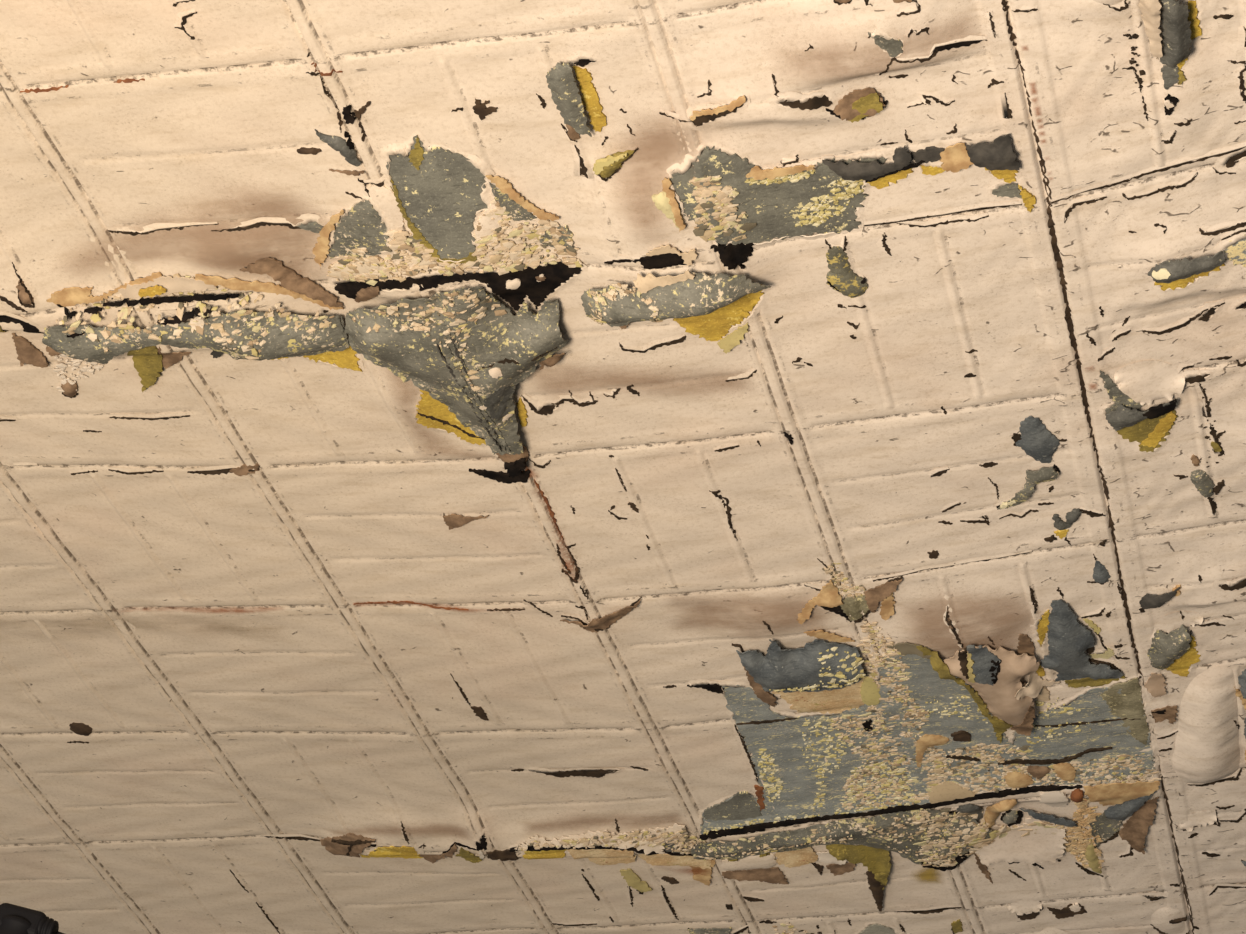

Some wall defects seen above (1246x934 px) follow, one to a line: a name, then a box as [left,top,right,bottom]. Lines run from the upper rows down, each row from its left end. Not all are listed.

peeling [171,0,197,40]
peeling [451,98,498,121]
peeling [536,50,638,182]
peeling [0,130,583,484]
peeling [581,123,1036,354]
peeling [1148,220,1246,294]
peeling [1086,296,1246,515]
peeling [1087,540,1122,595]
peeling [518,562,1227,934]
peeling [1234,669,1246,768]
crack [264,822,479,856]
crack [510,785,1082,922]